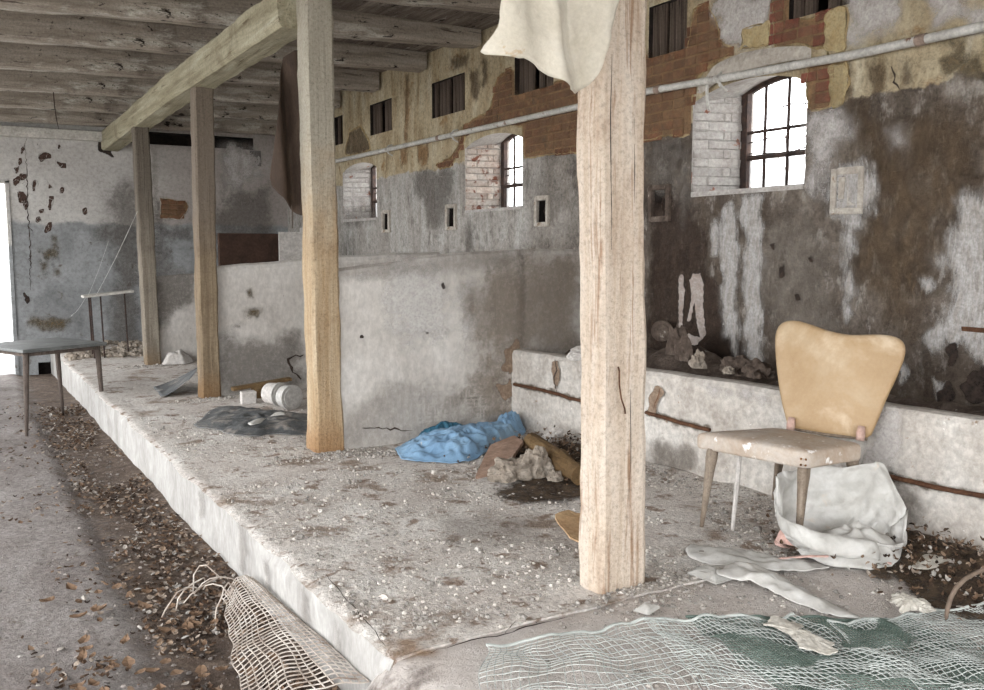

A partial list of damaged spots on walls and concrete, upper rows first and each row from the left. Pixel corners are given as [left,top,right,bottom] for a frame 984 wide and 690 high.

flaking render [436,67,578,170]
flaking render [643,0,851,143]
crack [22,139,32,287]
peeling [13,143,66,233]
flaking render [160,198,189,220]
damp [808,111,984,365]
crack [287,355,303,380]